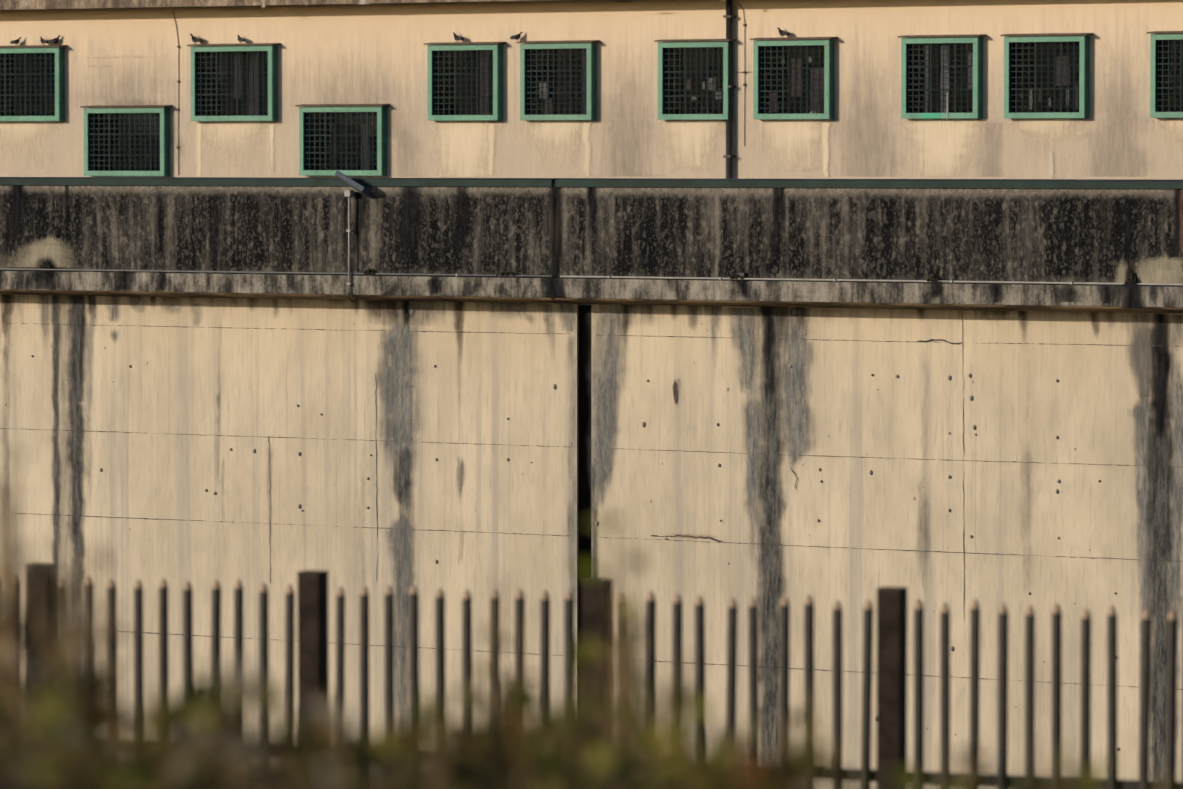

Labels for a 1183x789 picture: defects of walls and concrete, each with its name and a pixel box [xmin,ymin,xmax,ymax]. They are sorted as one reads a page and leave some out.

damp [1,294,12,328]
damp [40,295,95,619]
damp [111,296,178,339]
damp [352,193,365,249]
damp [355,300,436,685]
damp [434,120,496,251]
damp [549,181,560,277]
damp [591,304,652,566]
crack [650,534,720,542]
damp [733,307,809,765]
crack [916,317,965,611]
damp [1132,313,1183,781]